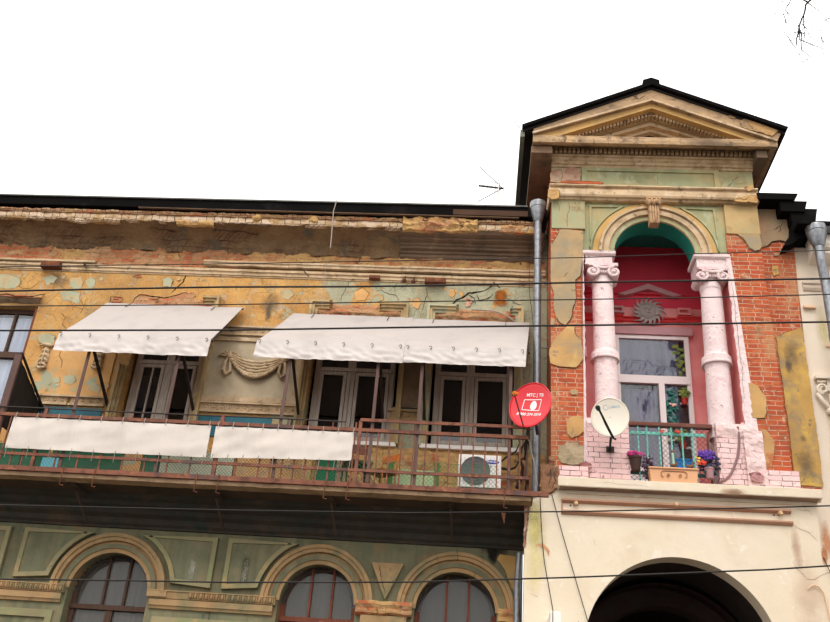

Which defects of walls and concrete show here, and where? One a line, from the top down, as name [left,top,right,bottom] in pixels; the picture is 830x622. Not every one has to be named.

spalling [68,216,121,225]
spalling [176,220,214,228]
flaking render [733,185,789,256]
peeling [0,274,103,304]
flaking render [110,277,196,306]
peeling [281,289,303,300]
crack [452,286,522,304]
flaking render [549,229,583,368]
flaking render [776,327,823,487]